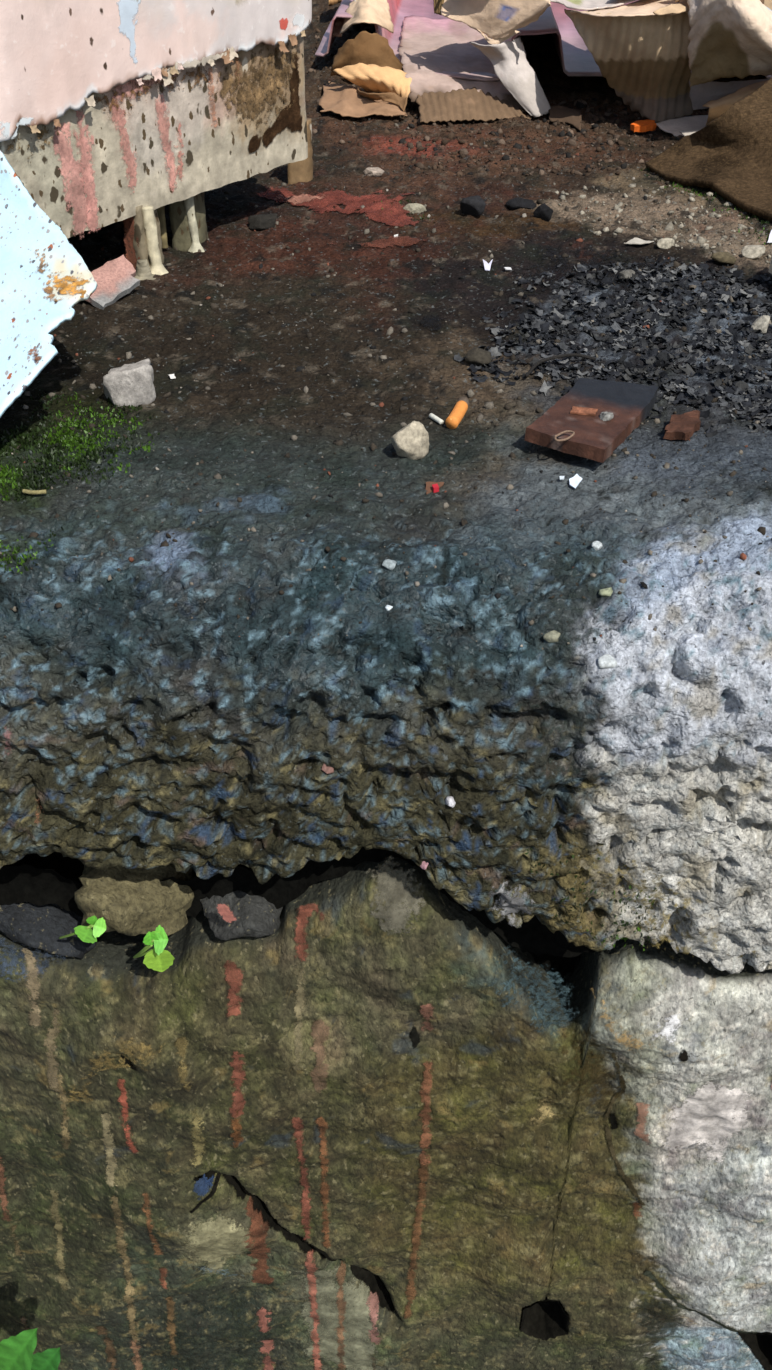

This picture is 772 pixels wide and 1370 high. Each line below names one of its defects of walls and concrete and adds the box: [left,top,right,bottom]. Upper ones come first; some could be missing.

corrosion [35,248,90,302]
spalling [367,856,426,934]
spalling [489,881,534,926]
spalling [488,947,579,1034]
crack [190,1172,395,1311]